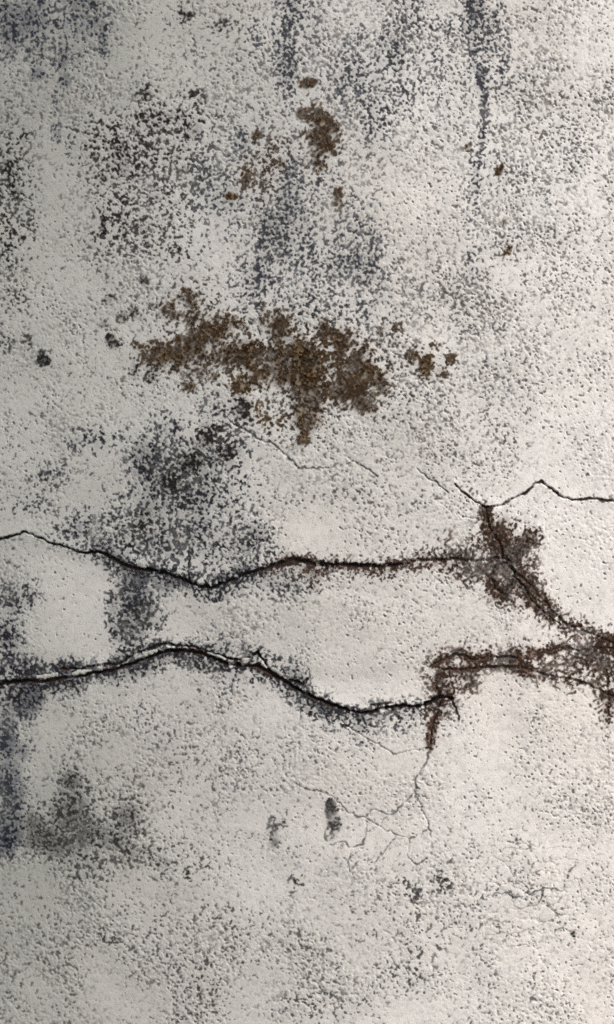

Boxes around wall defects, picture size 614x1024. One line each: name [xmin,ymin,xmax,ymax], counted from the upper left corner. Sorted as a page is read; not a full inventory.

corrosion [226,127,290,201]
crack [0,478,614,865]